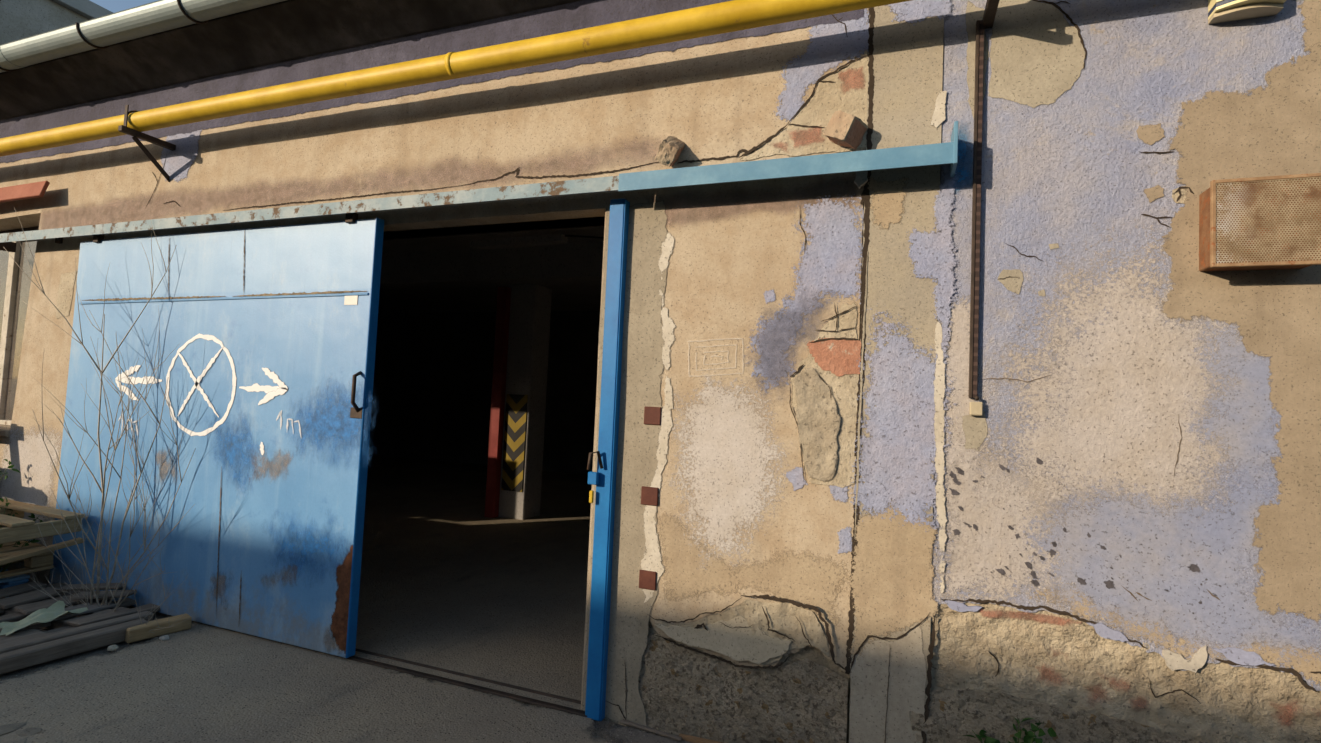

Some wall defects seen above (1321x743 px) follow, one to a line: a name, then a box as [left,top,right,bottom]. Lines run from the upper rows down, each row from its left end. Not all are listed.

crack [146,155,180,207]
crack [223,149,757,211]
peeling [640,0,1321,743]
crack [649,0,1321,743]